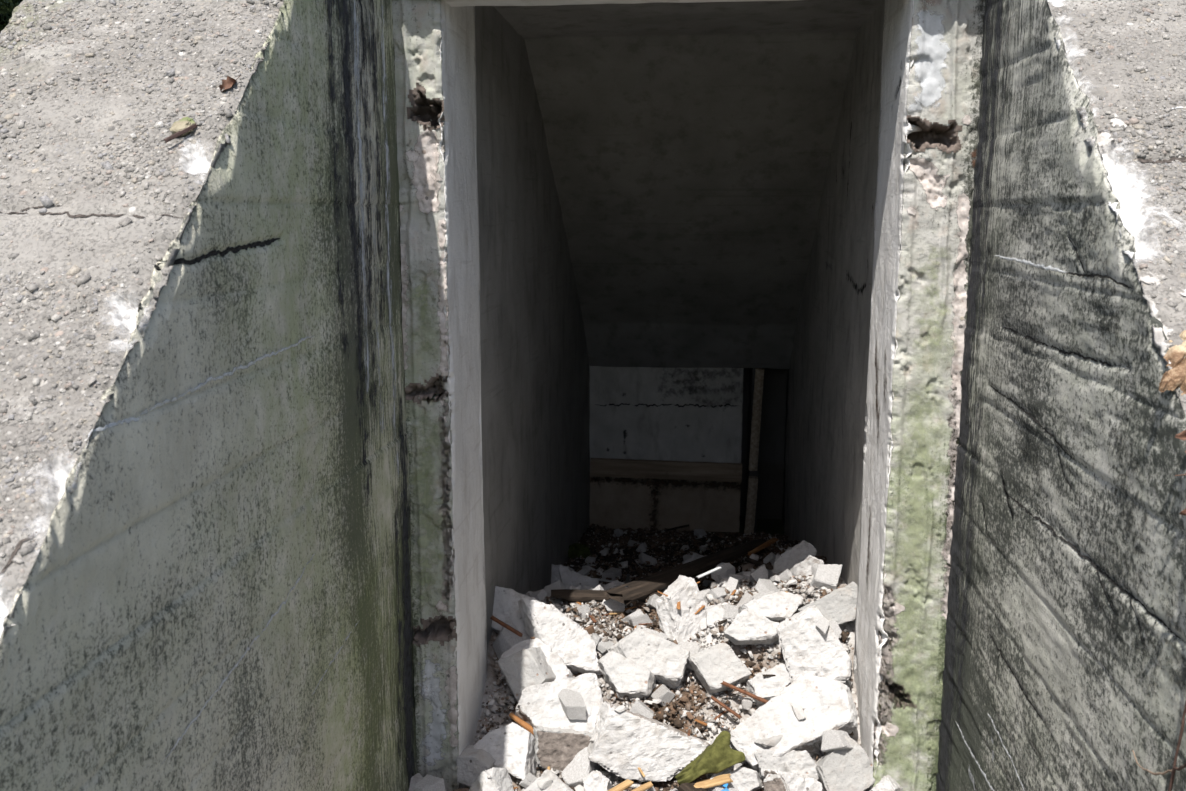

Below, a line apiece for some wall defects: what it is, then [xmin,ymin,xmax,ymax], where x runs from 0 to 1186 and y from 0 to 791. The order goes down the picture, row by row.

crack [0,205,184,218]
crack [155,238,280,271]
spalling [405,83,457,647]
flaking render [905,115,971,619]
damp [920,0,1067,791]
crack [1004,327,1130,368]
crack [1067,235,1132,289]
damp [1075,191,1126,360]
spalling [0,576,16,637]
spalling [35,455,77,534]
crack [983,480,1181,645]
damp [1077,415,1186,696]